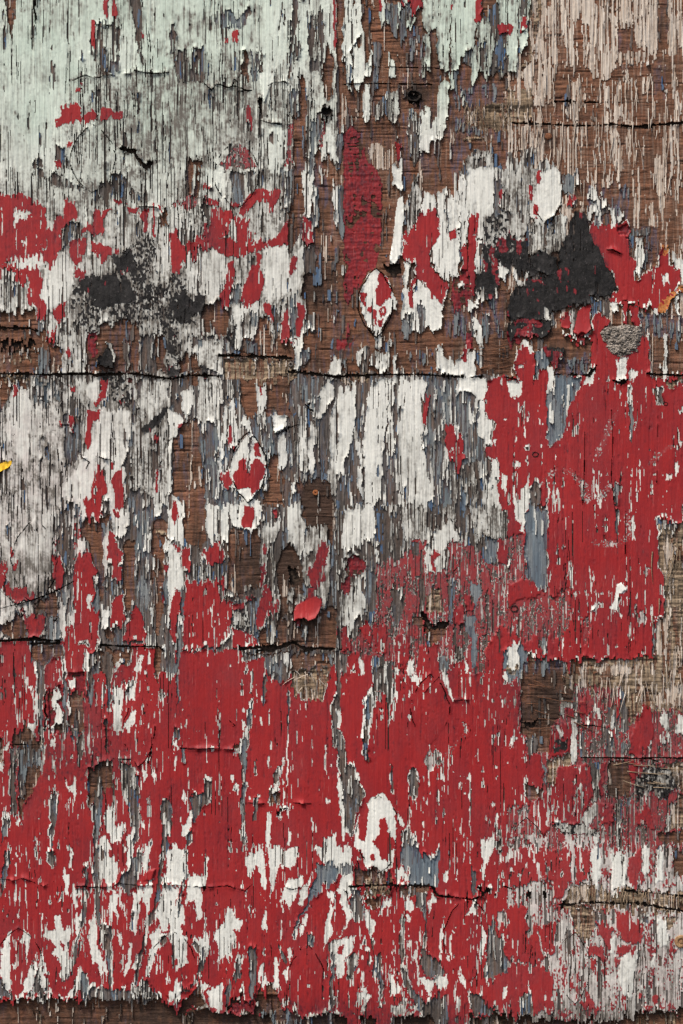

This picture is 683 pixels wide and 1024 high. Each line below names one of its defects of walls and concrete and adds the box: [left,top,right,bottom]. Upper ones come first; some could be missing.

peeling [219,0,683,529]
peeling [0,309,65,379]
crack [0,324,517,380]
crack [555,365,683,386]
peeling [172,415,208,549]
peeling [227,470,340,652]
crack [0,636,61,647]
crack [238,640,342,654]
peeling [517,517,683,750]
peeling [293,840,440,935]
crack [349,882,512,902]
crack [559,888,683,912]